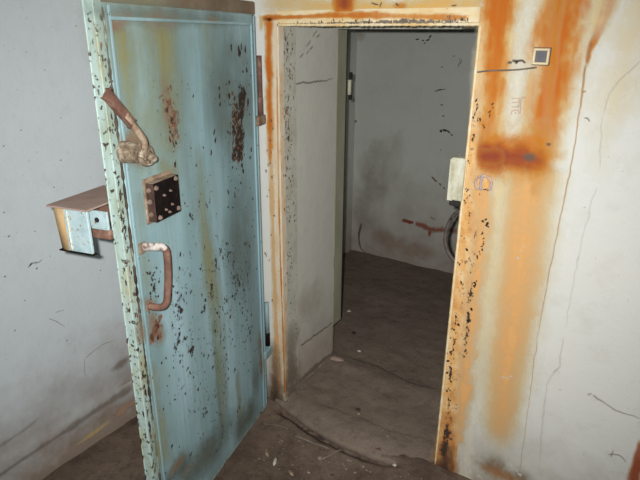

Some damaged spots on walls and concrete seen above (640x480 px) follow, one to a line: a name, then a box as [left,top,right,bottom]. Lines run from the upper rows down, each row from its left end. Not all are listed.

rust [259,0,614,472]
crack [280,414,369,463]
rust [482,460,527,480]